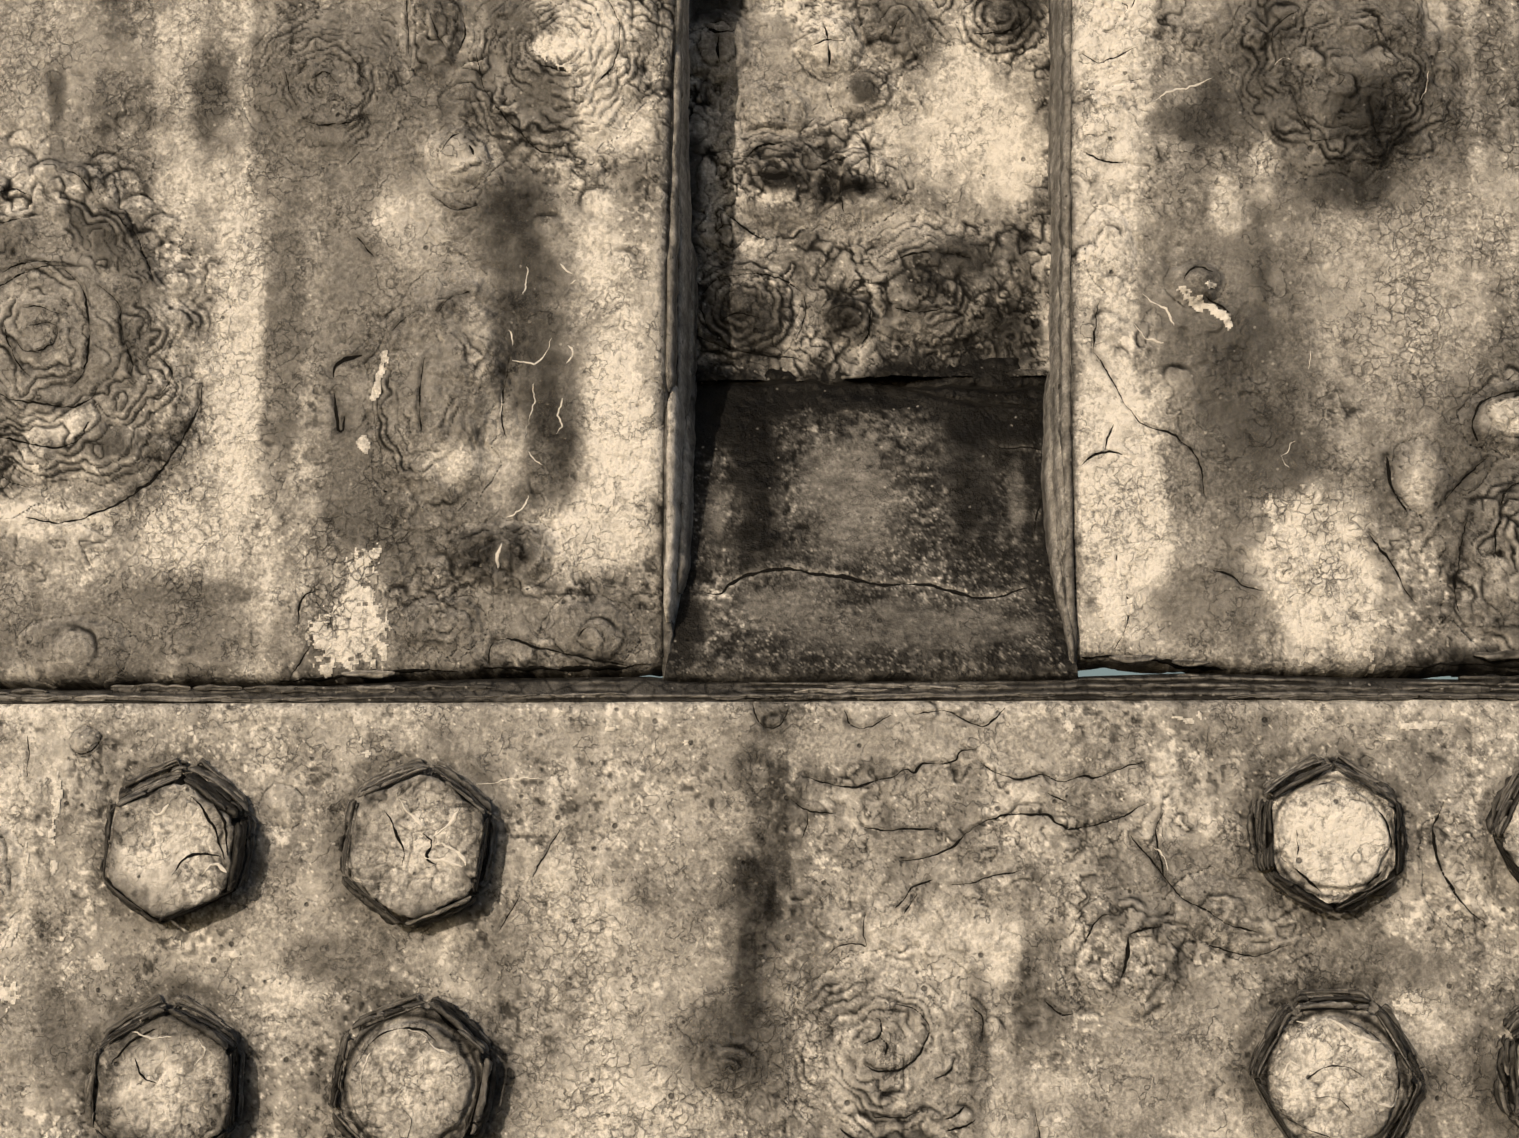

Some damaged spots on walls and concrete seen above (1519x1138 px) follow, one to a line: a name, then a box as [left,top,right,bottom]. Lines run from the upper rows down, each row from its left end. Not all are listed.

damp [1144,78,1212,106]
damp [509,330,574,365]
peeling [305,543,396,683]
crack [701,567,1027,600]
crack [791,708,1288,957]
crack [1284,830,1320,891]